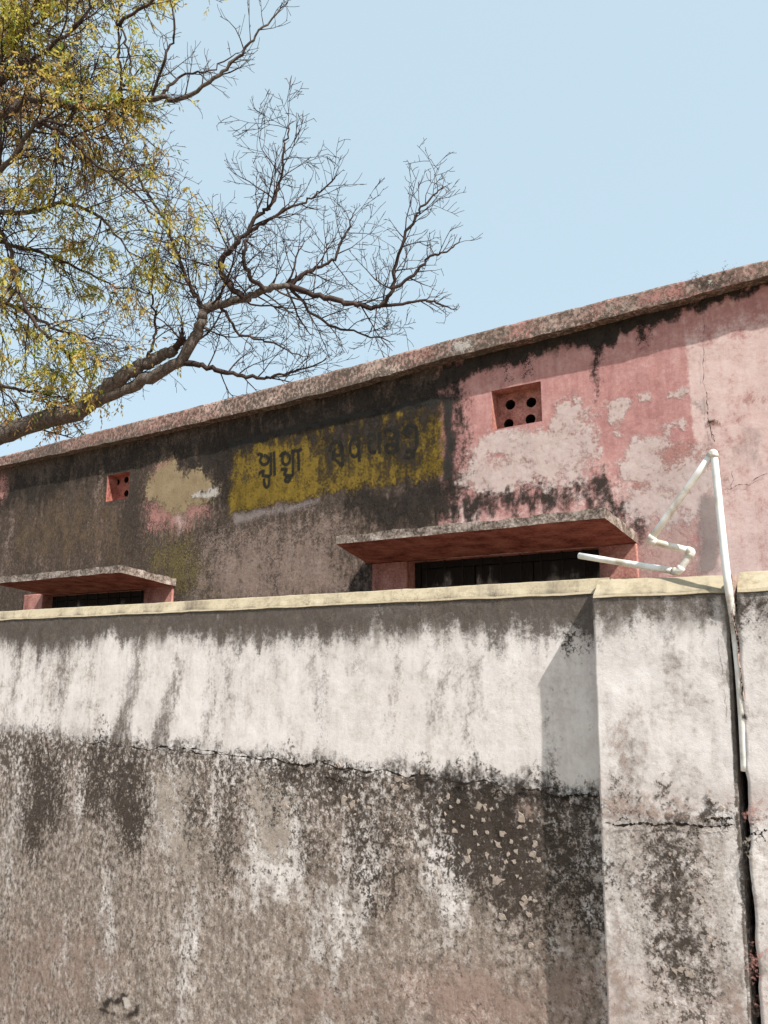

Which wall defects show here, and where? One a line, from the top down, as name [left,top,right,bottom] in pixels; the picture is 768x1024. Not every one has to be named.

flaking render [143,455,221,535]
flaking render [455,392,713,576]
damp [0,266,768,867]
damp [180,748,247,906]
crack [69,729,599,801]
flaking render [322,784,371,815]
flaking render [438,789,544,885]
damp [256,740,741,1004]
flaking render [519,895,537,917]
crack [606,817,767,842]